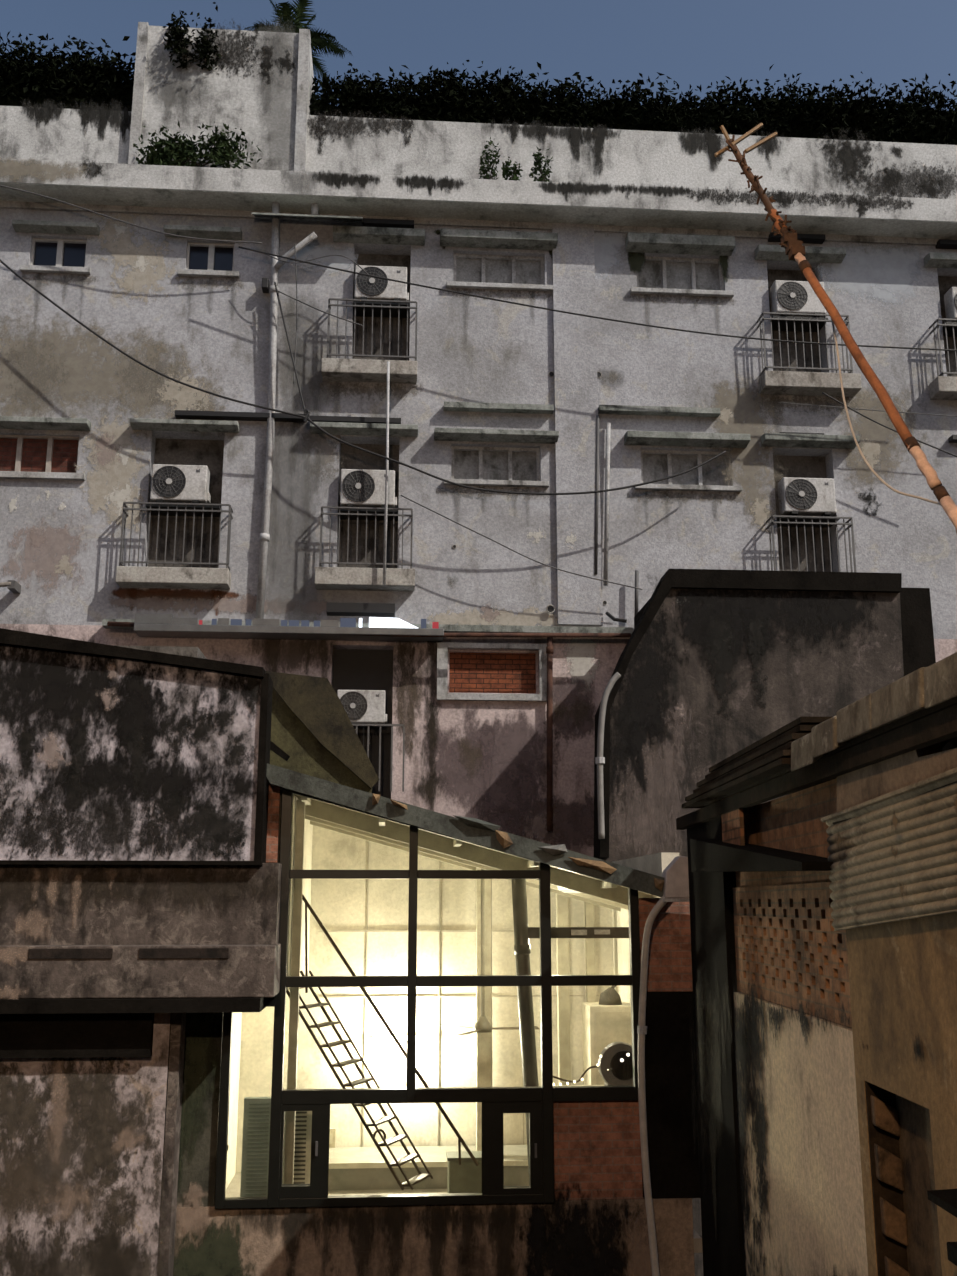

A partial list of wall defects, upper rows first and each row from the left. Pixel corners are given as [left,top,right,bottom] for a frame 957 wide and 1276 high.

water stain [22,100,132,140]
water stain [312,170,380,189]
water stain [307,110,414,154]
water stain [396,174,464,195]
mould [491,121,957,217]
water stain [394,575,878,854]
water stain [0,627,335,937]
water stain [0,1013,646,1276]
water stain [686,966,850,1276]